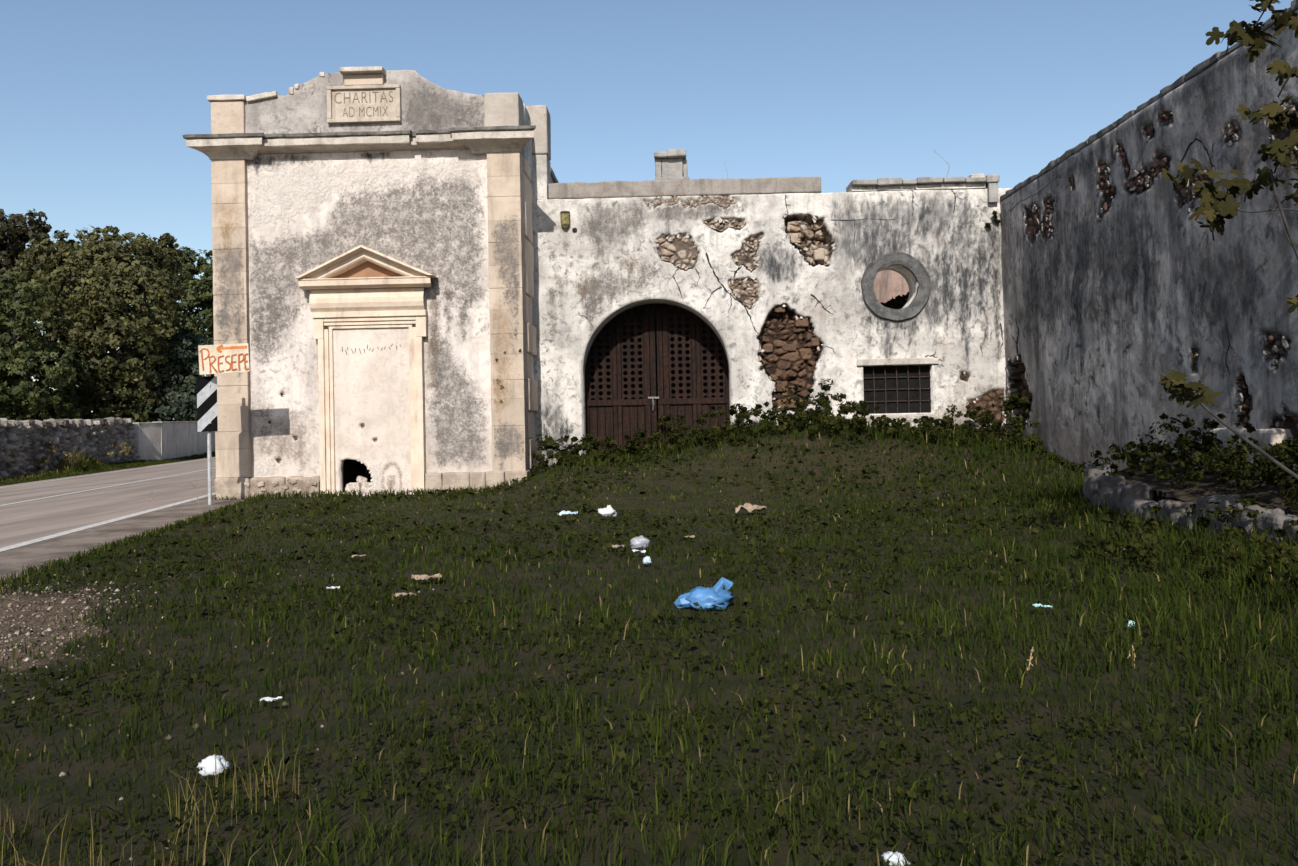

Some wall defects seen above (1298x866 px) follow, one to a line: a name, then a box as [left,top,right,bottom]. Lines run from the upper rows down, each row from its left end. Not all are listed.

leakage [215,180,524,466]
spalling [644,195,763,308]
spalling [758,304,824,411]
spalling [783,196,971,266]
leakage [859,214,1001,359]
leakage [1019,47,1263,367]